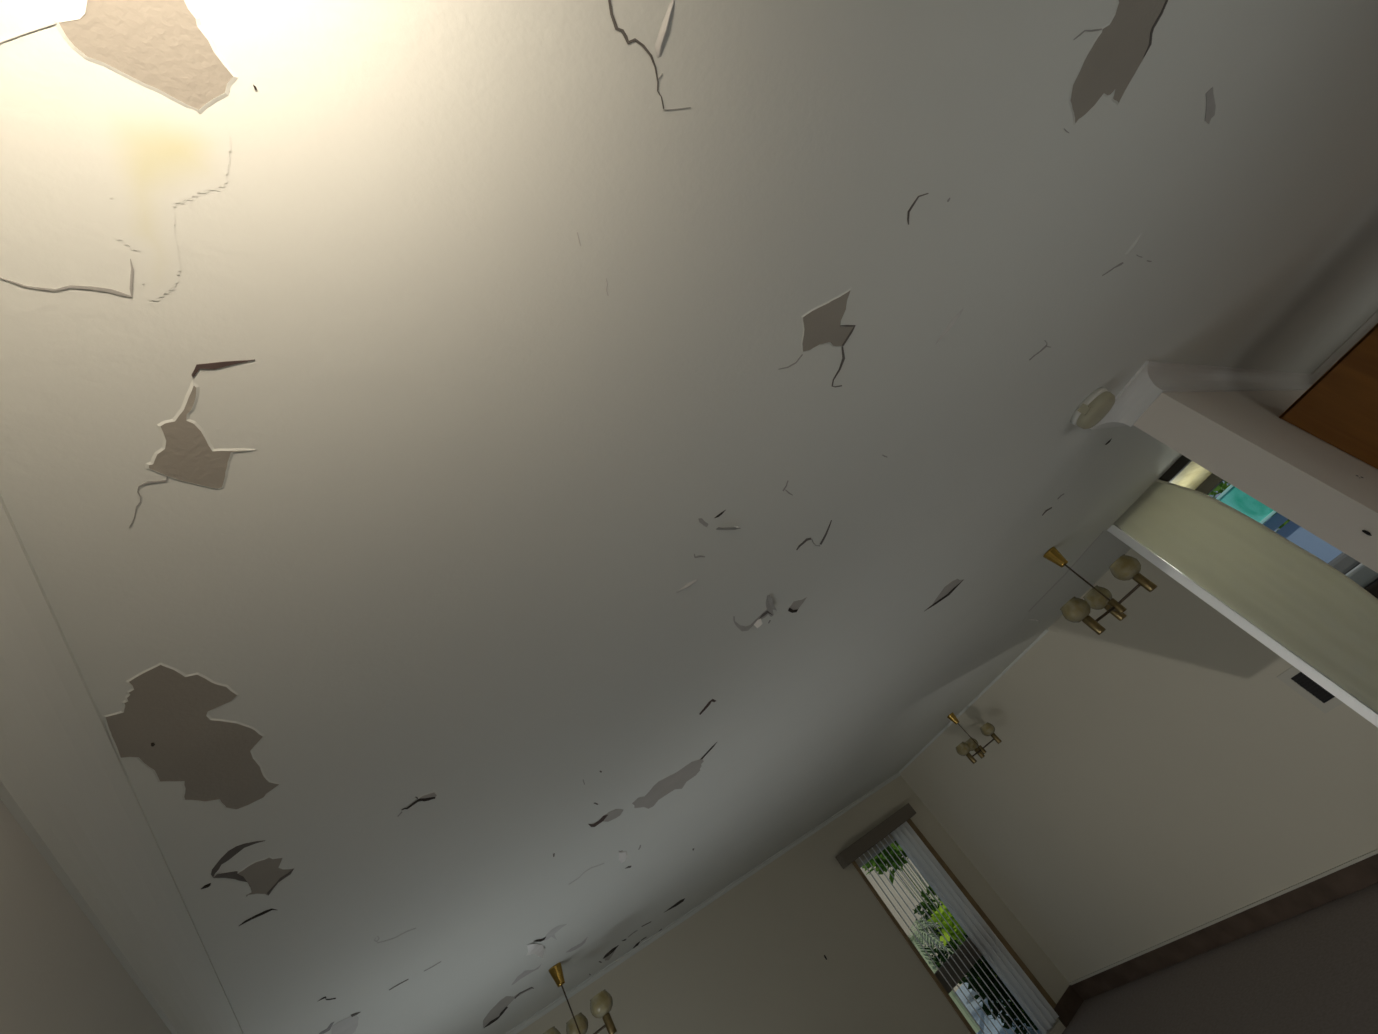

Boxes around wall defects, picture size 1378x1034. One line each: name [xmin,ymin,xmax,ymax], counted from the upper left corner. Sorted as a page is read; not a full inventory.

peeling [0,0,257,114]
crack [608,0,691,110]
peeling [1063,0,1169,133]
crack [0,259,134,297]
peeling [778,288,856,387]
peeling [129,360,257,528]
peeling [103,663,281,810]
peeling [589,742,717,827]
peeling [201,840,295,898]
peeling [483,987,534,1028]